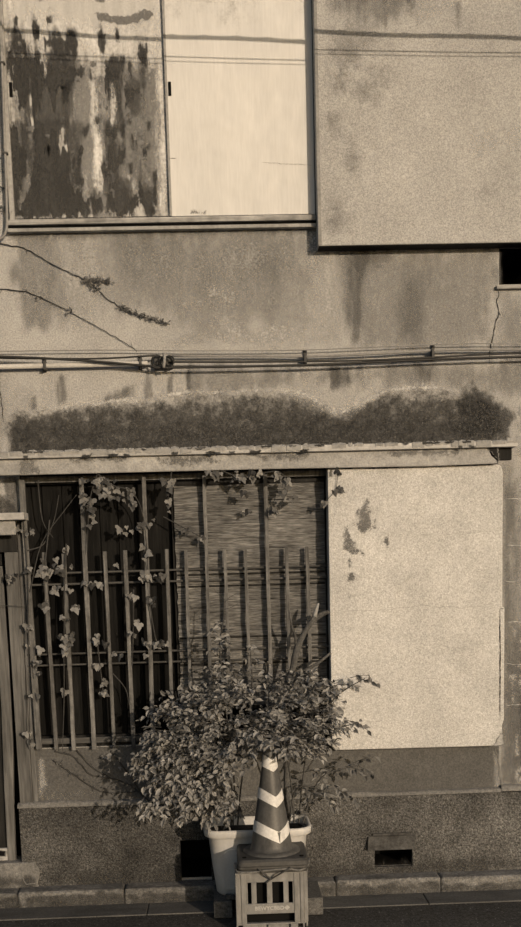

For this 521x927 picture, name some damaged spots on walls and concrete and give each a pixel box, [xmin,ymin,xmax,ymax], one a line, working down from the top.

peeling [6,0,168,220]
water stain [13,229,495,351]
crack [489,290,521,363]
water stain [503,473,521,648]
water stain [502,667,521,784]